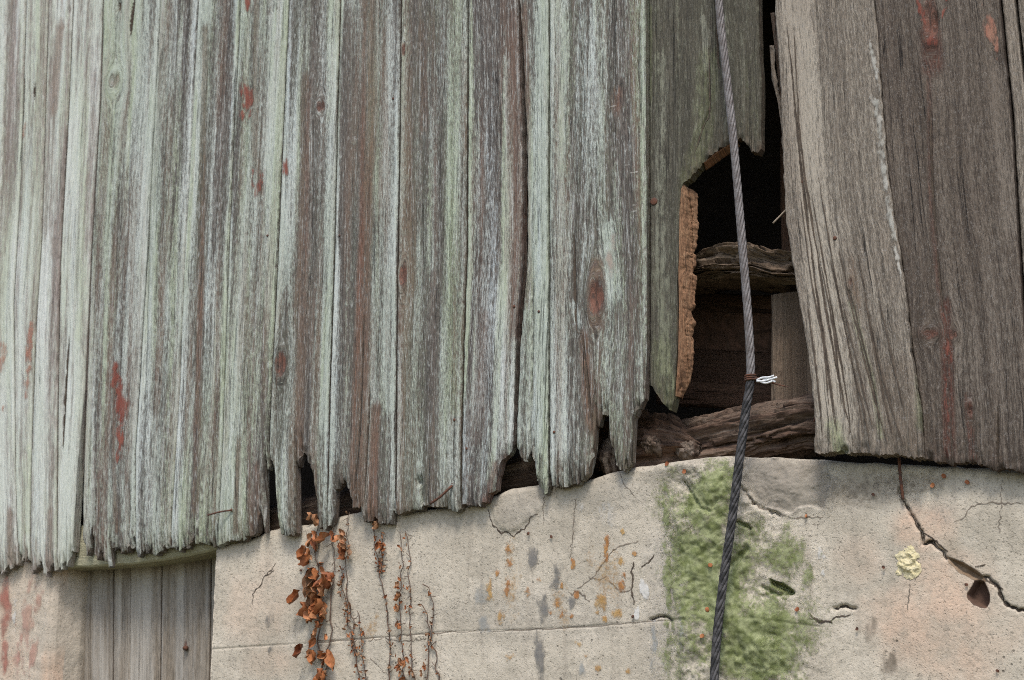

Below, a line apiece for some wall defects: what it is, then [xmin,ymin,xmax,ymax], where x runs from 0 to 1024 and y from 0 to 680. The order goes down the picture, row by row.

peeling [25,322,33,397]
peeling [112,362,127,462]
crack [308,541,676,675]
corrosion [487,545,514,598]
corrosion [594,595,622,622]
corrosion [604,529,637,590]
damp [652,479,705,675]
damp [748,584,778,680]
damp [738,522,825,591]
crack [900,492,948,610]
spalling [947,557,990,608]
crack [975,564,1024,612]